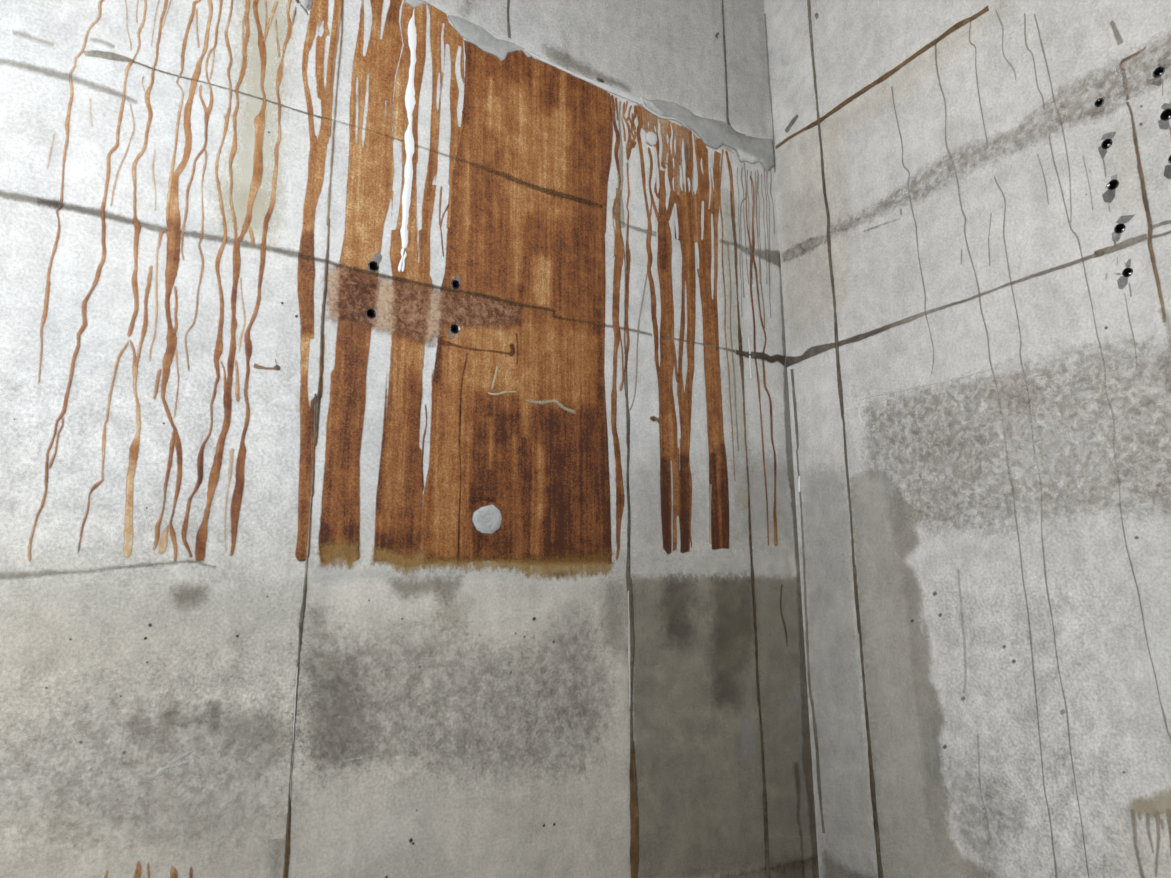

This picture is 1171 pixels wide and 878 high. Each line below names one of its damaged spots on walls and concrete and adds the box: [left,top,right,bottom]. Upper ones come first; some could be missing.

peeling [448,15,642,105]
rust [28,0,295,561]
rust [295,0,729,579]
water stain [891,87,934,367]
rust [134,861,150,878]